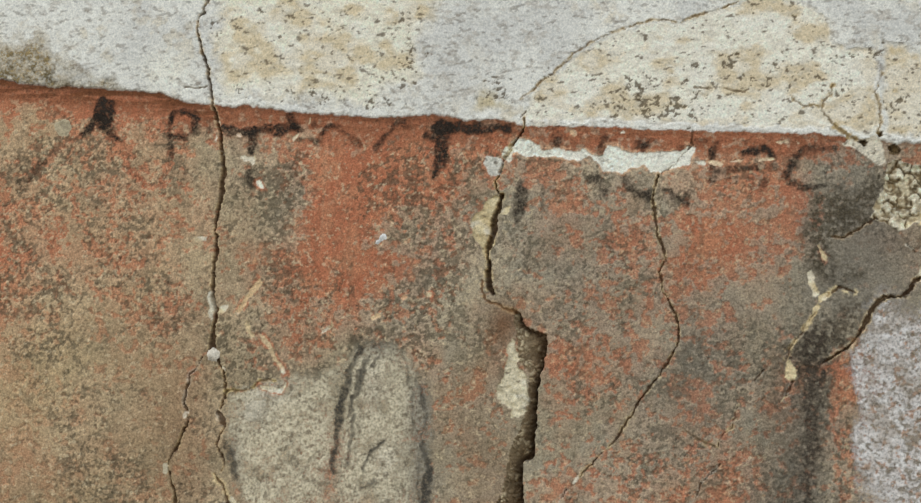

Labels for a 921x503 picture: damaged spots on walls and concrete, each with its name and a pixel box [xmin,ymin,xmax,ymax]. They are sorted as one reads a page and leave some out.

peeling [463,0,921,233]
crack [694,86,750,95]
crack [791,72,884,142]
crack [162,0,277,503]
crack [469,0,740,503]
crack [753,217,921,406]